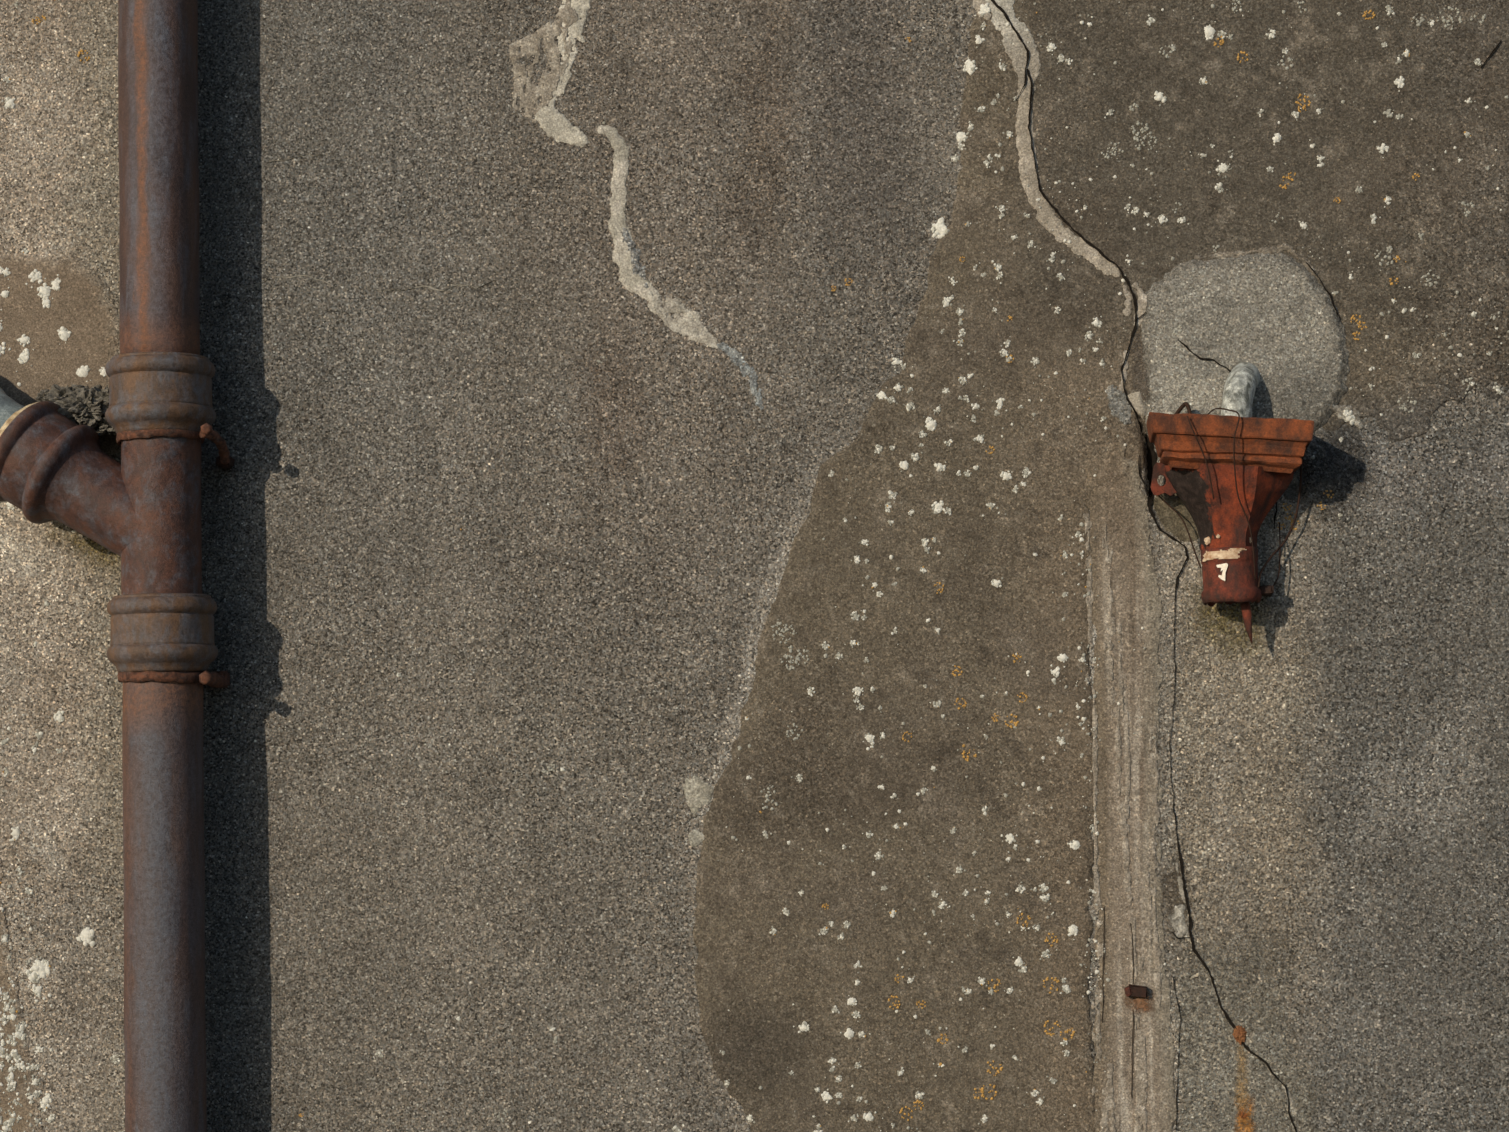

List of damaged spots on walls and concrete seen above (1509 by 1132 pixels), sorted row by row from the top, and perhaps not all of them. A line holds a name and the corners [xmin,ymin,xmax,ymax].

crack [509,0,764,410]
spalling [1105,384,1146,425]
crack [972,0,1297,1132]
spalling [683,774,713,847]
spalling [1167,862,1193,939]